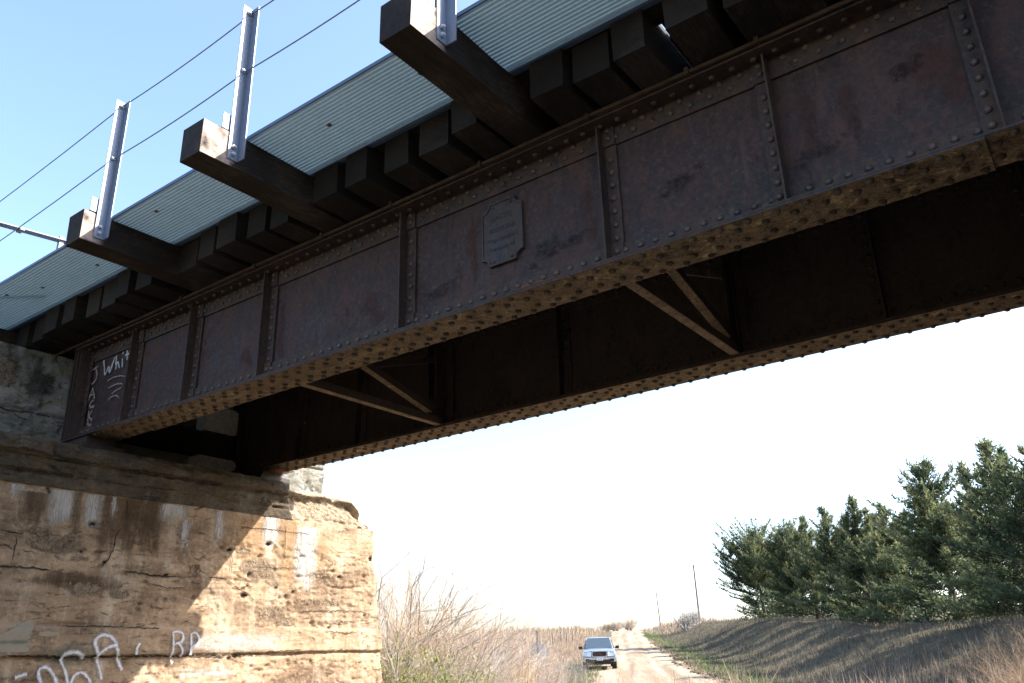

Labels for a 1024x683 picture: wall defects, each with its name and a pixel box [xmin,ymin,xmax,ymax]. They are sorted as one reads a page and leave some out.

water stain [11,484,189,552]
crack [0,446,309,601]
water stain [37,572,120,590]